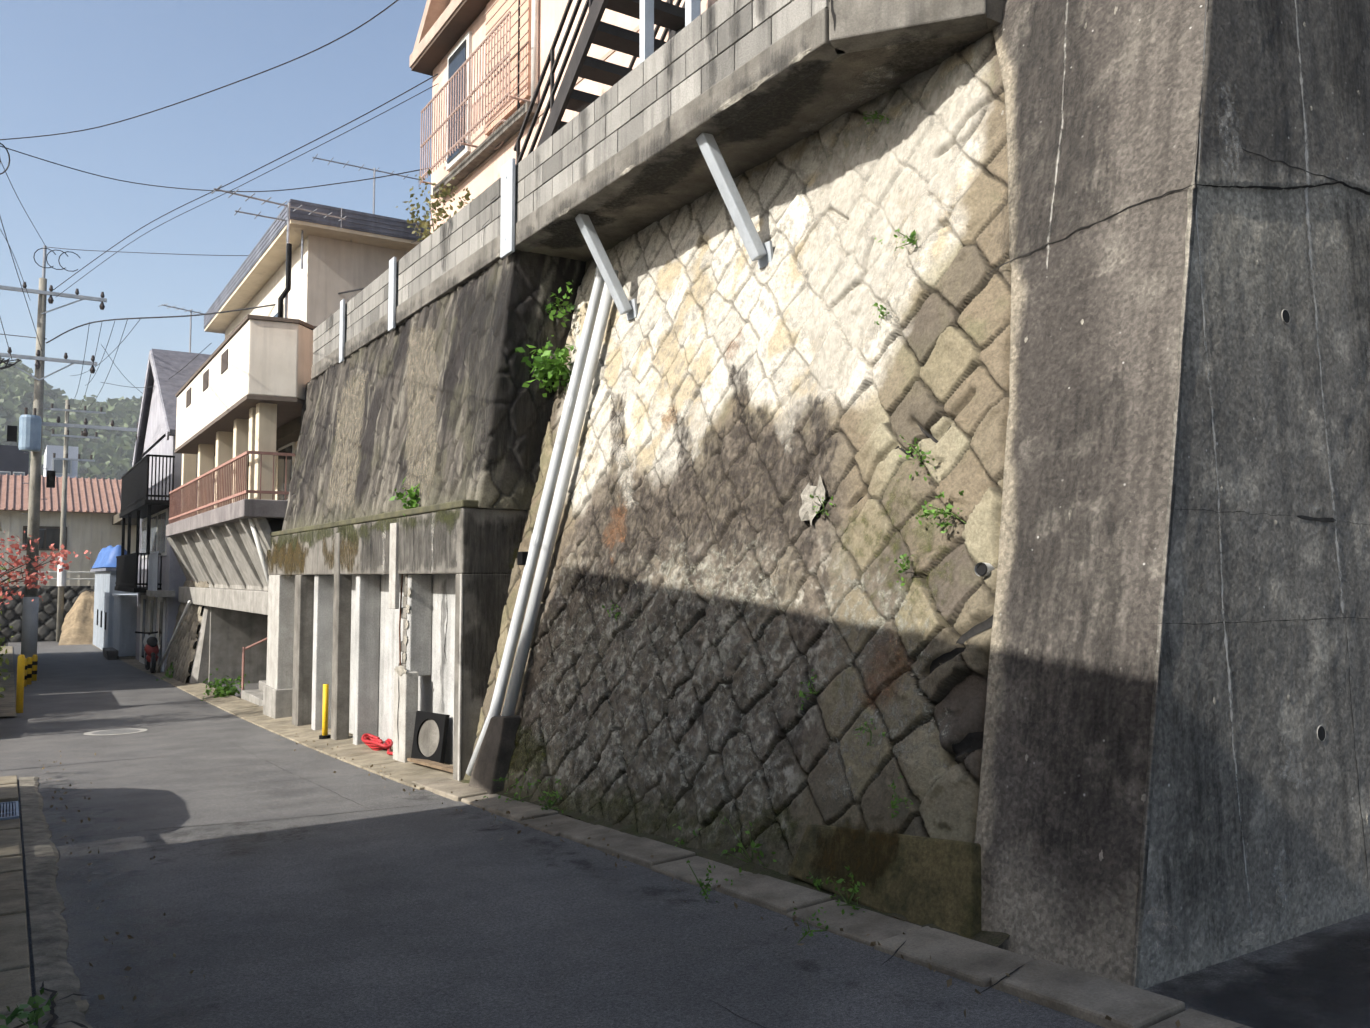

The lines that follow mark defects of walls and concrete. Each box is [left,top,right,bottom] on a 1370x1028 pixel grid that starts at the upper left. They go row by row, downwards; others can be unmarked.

leakage [520,113,702,249]
crack [987,147,1370,275]
leakage [571,37,981,614]
crack [1175,509,1367,525]
crack [1143,617,1369,886]